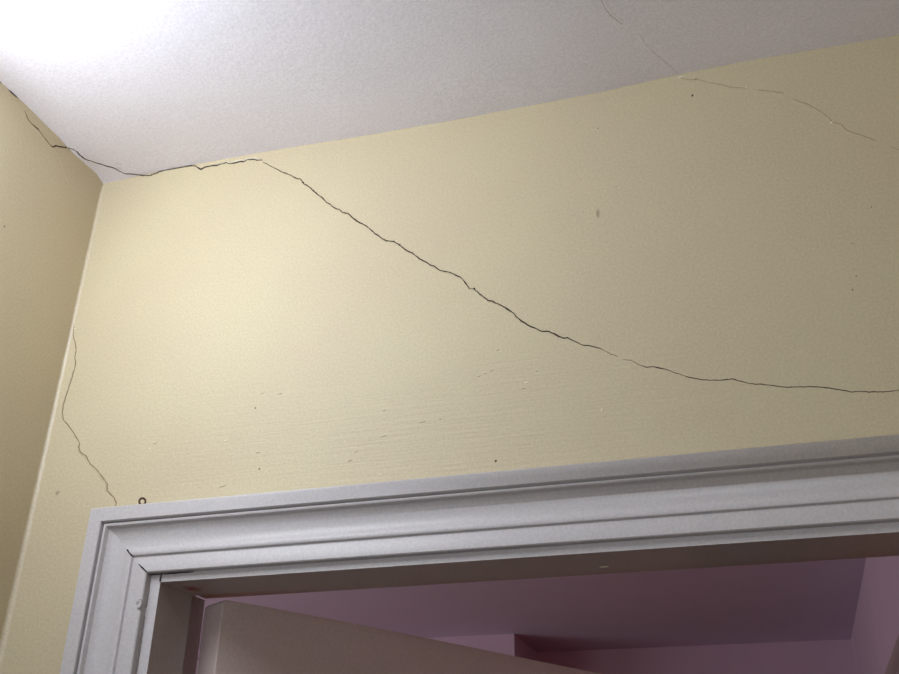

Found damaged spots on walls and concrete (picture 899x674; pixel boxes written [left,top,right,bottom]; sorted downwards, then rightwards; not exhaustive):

crack [0,76,899,393]
crack [61,324,117,506]